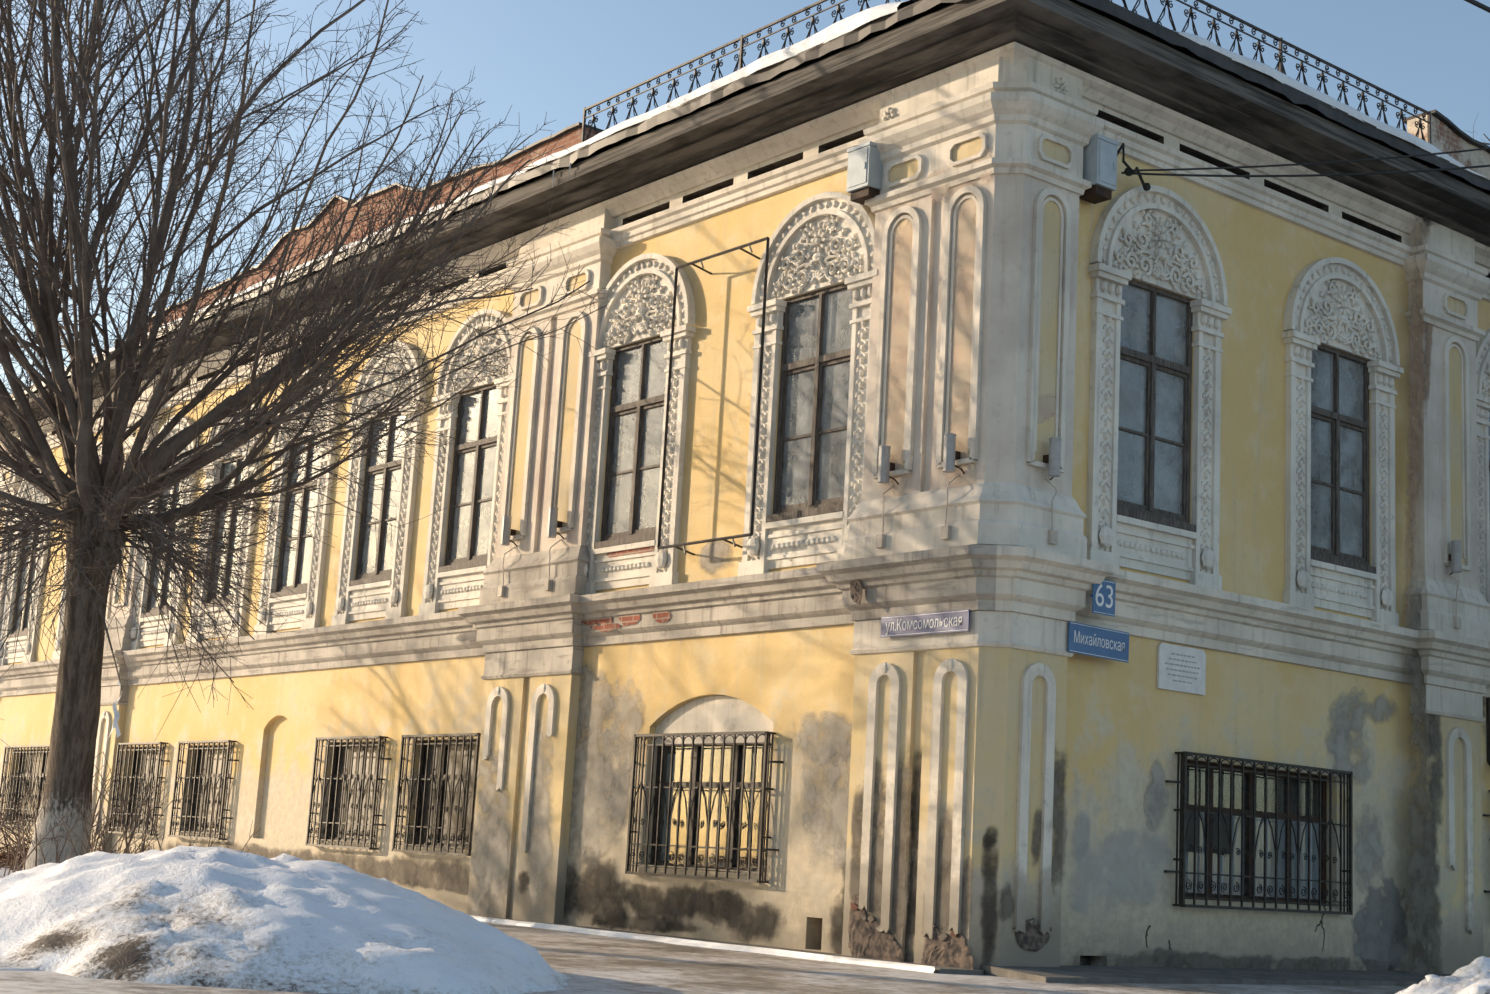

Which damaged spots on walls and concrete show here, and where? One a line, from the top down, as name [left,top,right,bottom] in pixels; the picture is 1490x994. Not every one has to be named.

flaking render [581,611,671,632]
damp [199,755,509,916]
damp [528,729,552,903]
damp [564,855,777,940]
flaking render [848,895,903,962]
damp [799,714,1014,970]
flaking render [921,924,973,969]
damp [1033,759,1067,882]
damp [1408,651,1443,974]